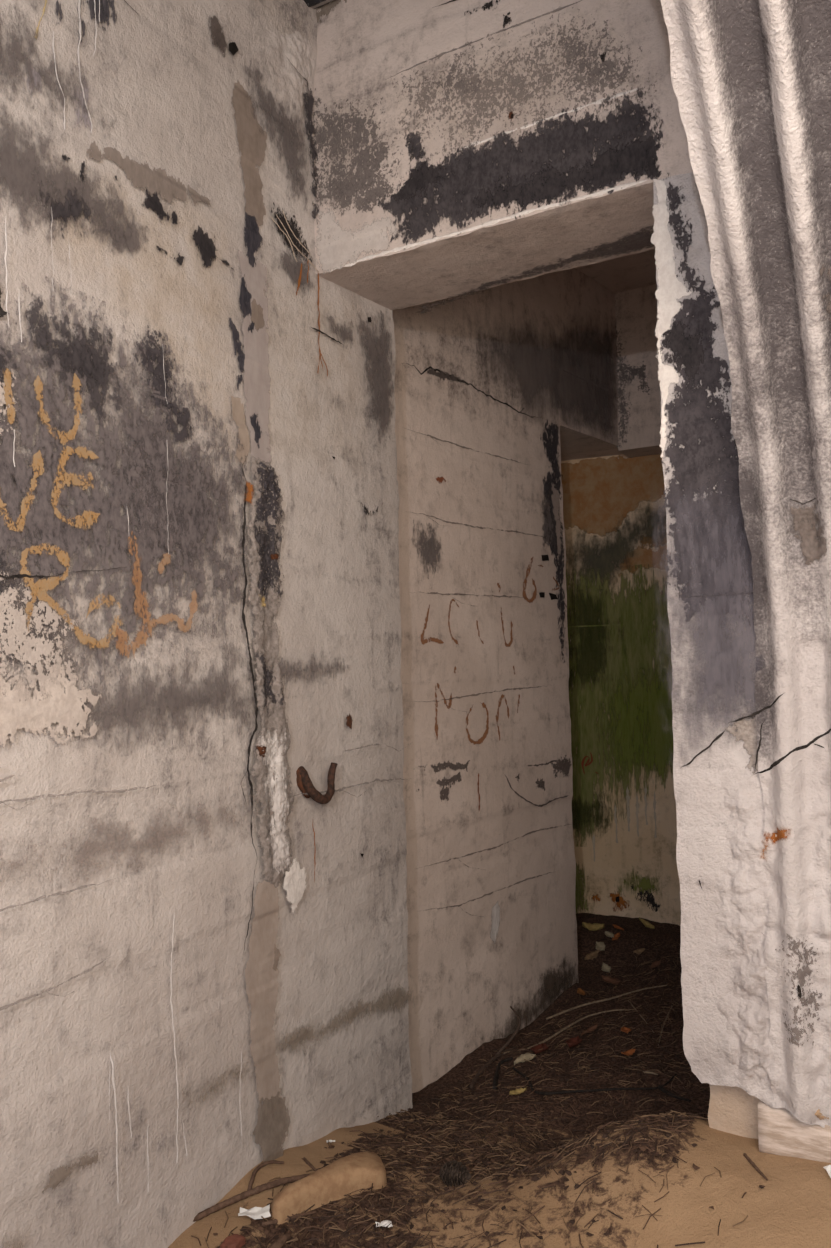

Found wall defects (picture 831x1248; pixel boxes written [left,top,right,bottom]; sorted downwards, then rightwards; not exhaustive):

water stain [34,0,63,39]
water stain [52,0,117,133]
water stain [231,80,319,293]
peeling [0,370,18,436]
crack [0,567,124,578]
peeling [0,571,102,748]
crack [241,457,258,954]
crack [290,744,406,797]
crack [682,693,831,774]